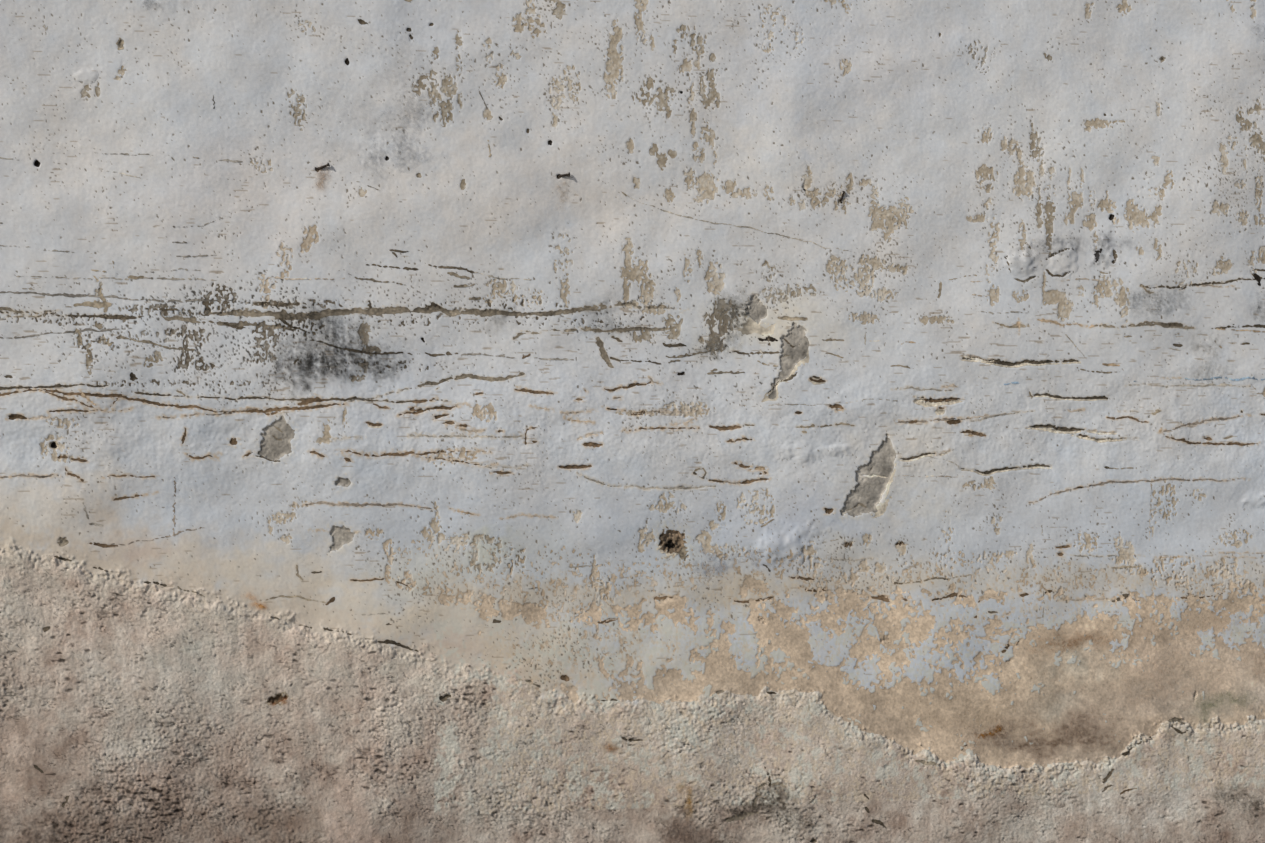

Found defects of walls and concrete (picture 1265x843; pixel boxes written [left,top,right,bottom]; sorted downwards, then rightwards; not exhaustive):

peeling [632,24,774,204]
peeling [981,123,1174,261]
crack [0,245,686,418]
spalling [329,233,908,402]
crack [981,269,1265,374]
crack [54,455,213,572]
spalling [256,411,295,462]
crack [310,429,529,465]
spalling [825,434,948,518]
crack [258,563,420,652]
peeling [329,462,1265,769]
damp [732,792,797,817]